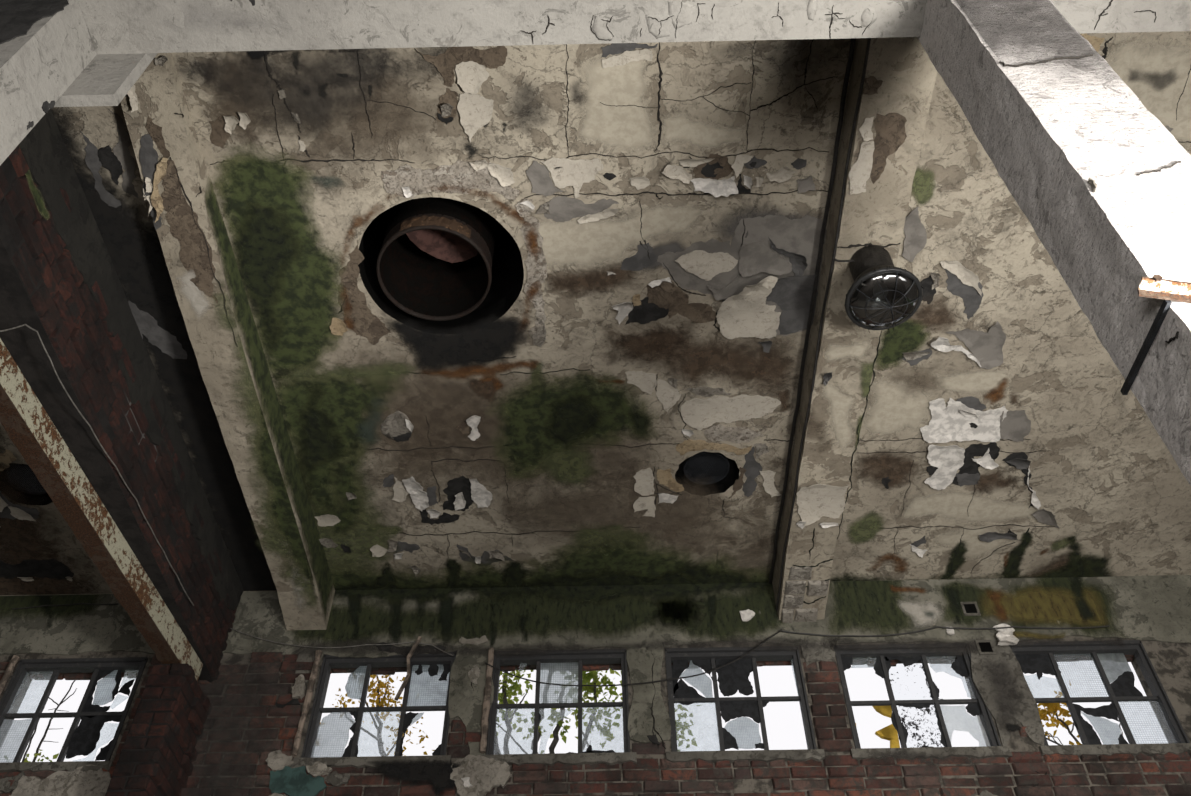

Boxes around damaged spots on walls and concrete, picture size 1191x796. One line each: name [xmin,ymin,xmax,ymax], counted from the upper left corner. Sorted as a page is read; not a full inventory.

peeling [415,46,507,143]
peeling [848,113,907,195]
crack [1136,65,1191,176]
water stain [233,204,300,345]
water stain [381,144,685,347]
peeling [608,215,827,353]
peeling [902,261,1006,369]
water stain [255,403,313,579]
water stain [293,361,542,533]
peeling [383,474,493,525]
water stain [330,395,774,642]
peeling [920,396,1060,529]